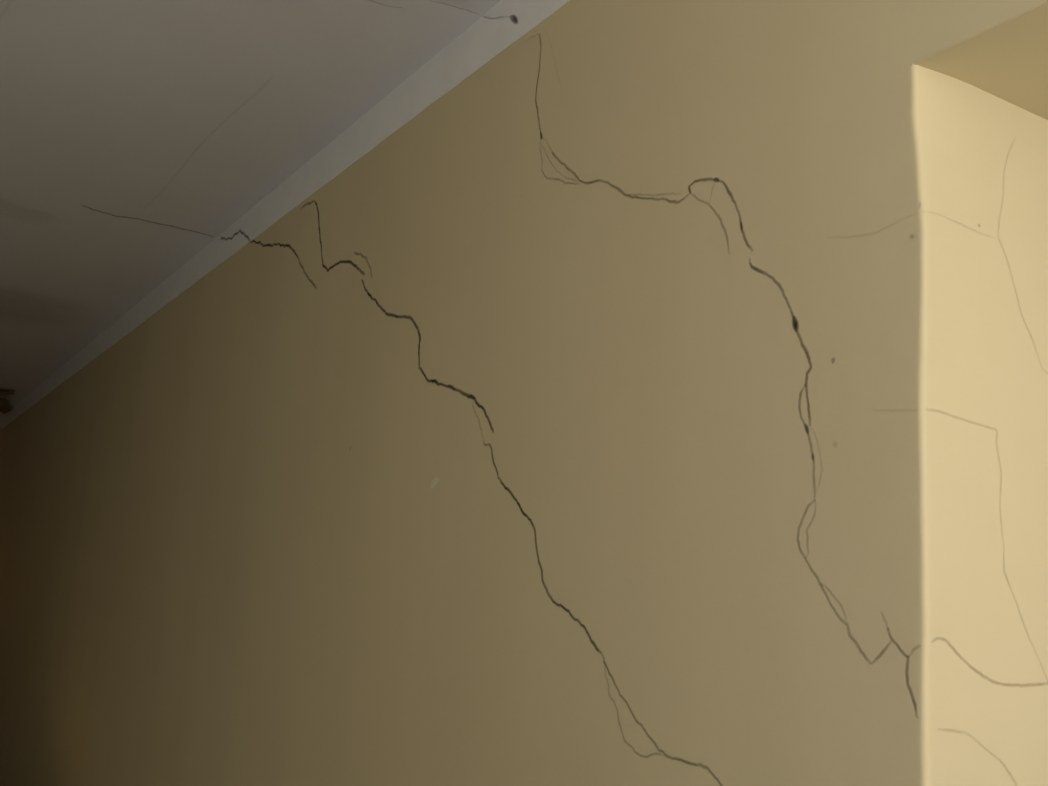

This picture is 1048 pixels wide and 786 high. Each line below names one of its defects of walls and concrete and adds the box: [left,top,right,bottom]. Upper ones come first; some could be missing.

crack [222,203,491,426]
crack [492,457,535,531]
crack [555,603,598,651]